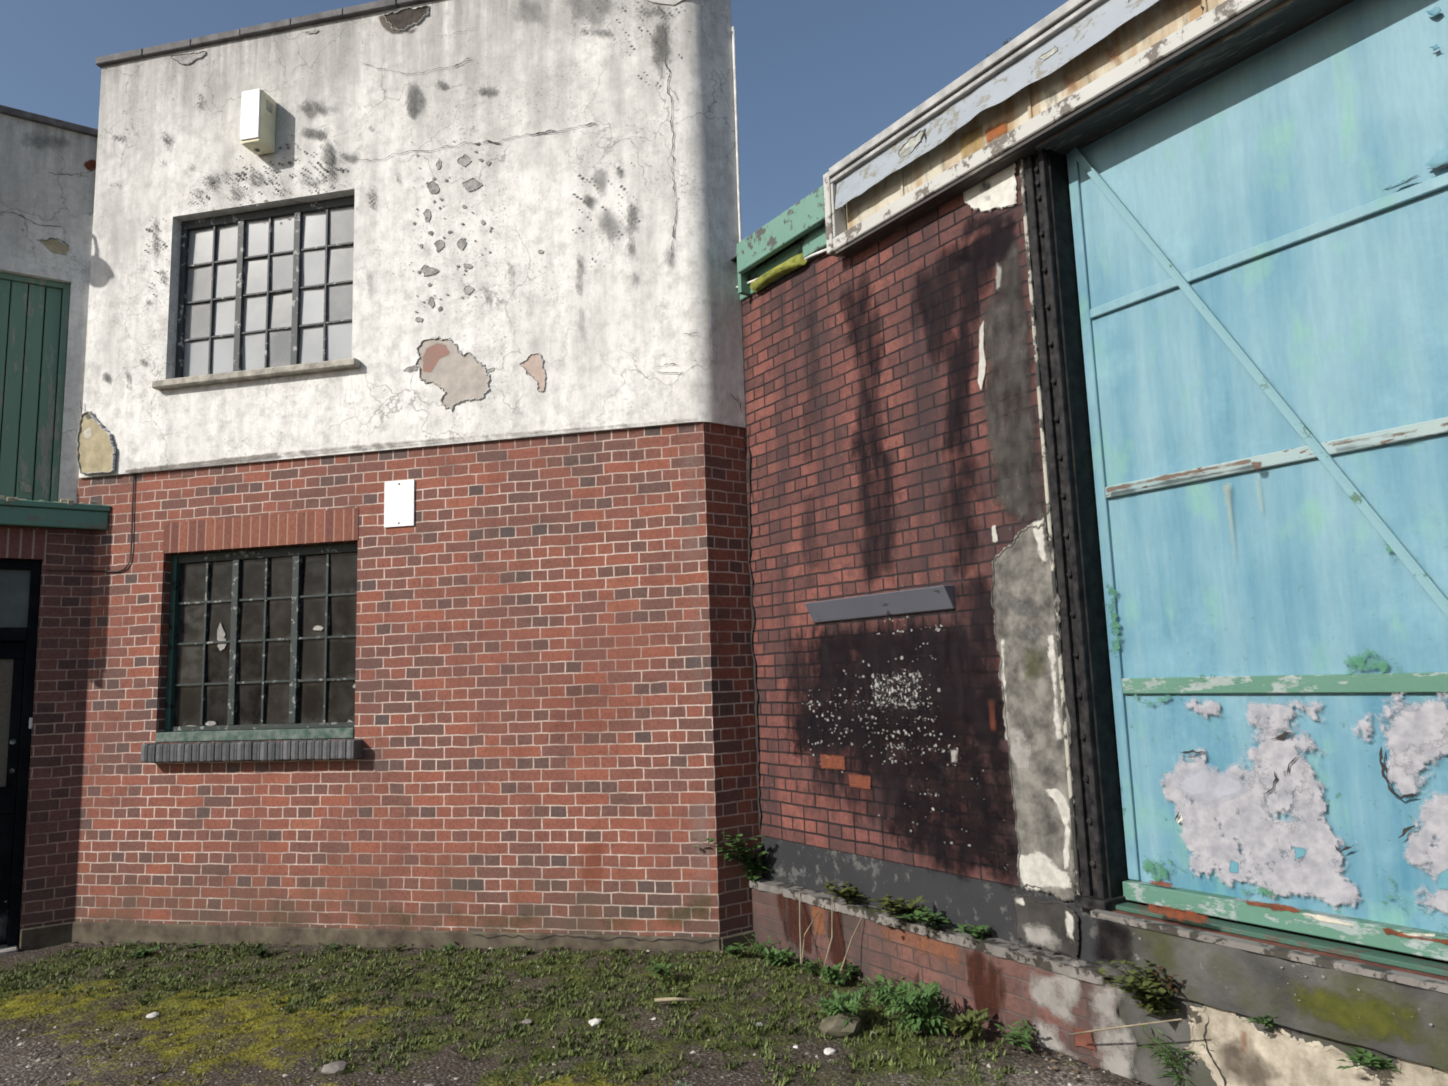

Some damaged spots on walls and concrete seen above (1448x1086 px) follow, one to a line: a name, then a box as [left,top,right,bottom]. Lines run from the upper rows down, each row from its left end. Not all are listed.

peeling [403,336,494,412]
peeling [409,141,495,322]
crack [665,32,677,264]
water stain [842,282,893,579]
water stain [950,407,977,571]
water stain [914,216,1014,387]
flaking render [963,163,1017,212]
flaking render [978,240,1079,960]
water stain [802,616,961,832]
peeling [1142,699,1360,910]
peeling [1352,692,1448,932]
flaking render [1184,1004,1448,1086]